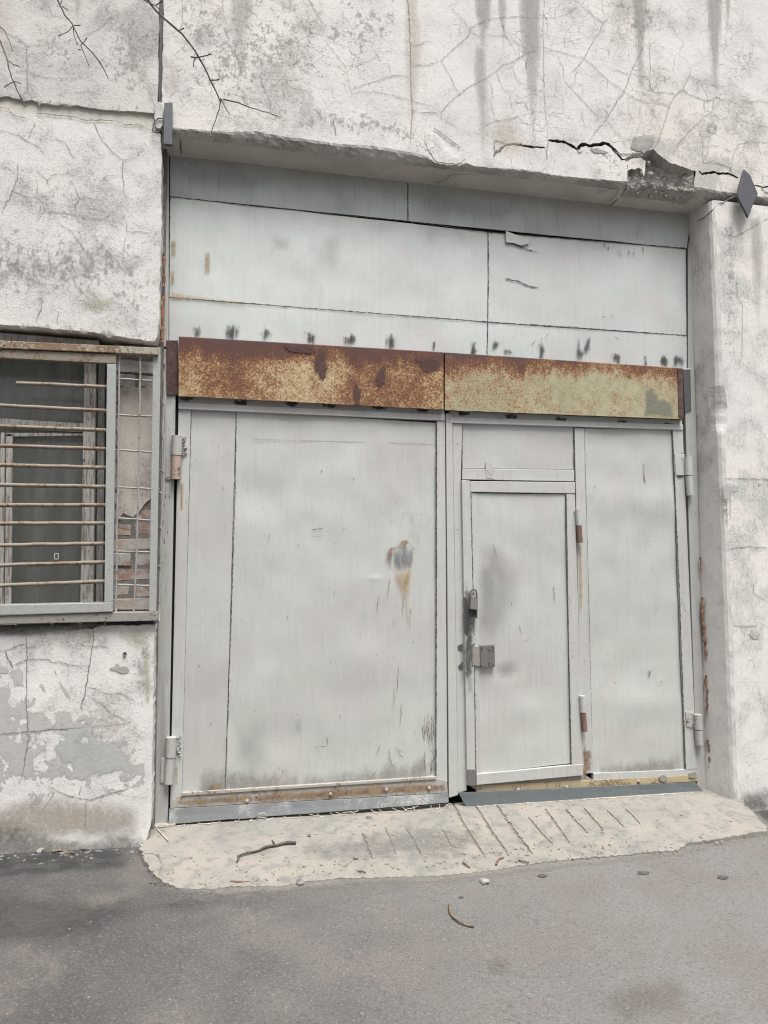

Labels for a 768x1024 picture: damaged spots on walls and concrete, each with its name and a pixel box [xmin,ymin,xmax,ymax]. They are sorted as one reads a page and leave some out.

leakage [478,0,504,27]
leakage [522,0,538,64]
leakage [709,0,729,62]
crack [311,0,768,237]
crack [0,1,152,322]
spalling [620,135,694,205]
corrosion [284,344,328,380]
corrosion [415,357,440,372]
crack [0,630,134,784]
peeling [0,664,144,832]
crack [42,785,137,825]
corrosion [186,784,443,805]